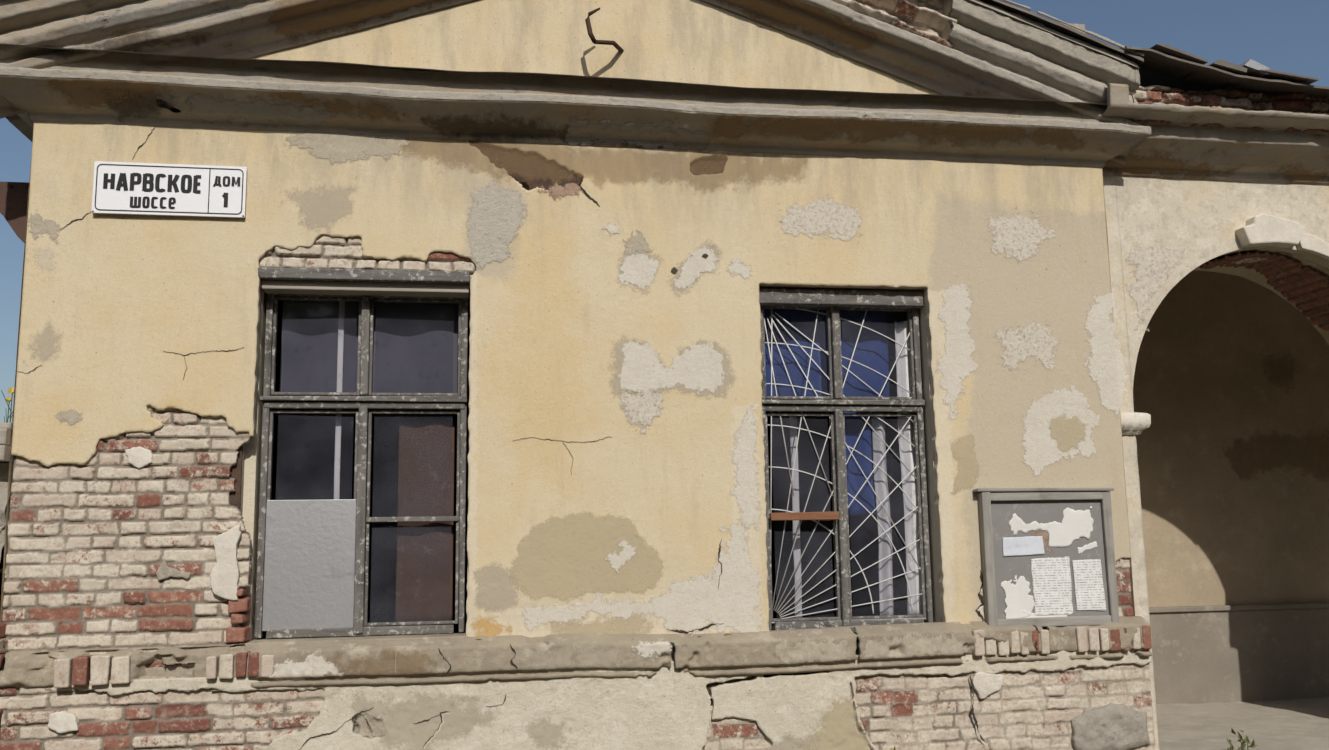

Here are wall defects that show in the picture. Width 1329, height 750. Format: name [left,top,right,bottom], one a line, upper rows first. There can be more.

peeling [985,207,1056,262]
flaking render [1200,250,1329,331]
crack [164,347,244,379]
peeling [610,338,733,435]
peeling [935,284,979,420]
peeling [995,322,1060,371]
peeling [1021,292,1129,476]
crack [514,436,609,475]
flaking render [0,405,344,750]
water stain [511,513,662,601]
flaking render [774,558,1155,750]
flaking render [702,706,772,750]